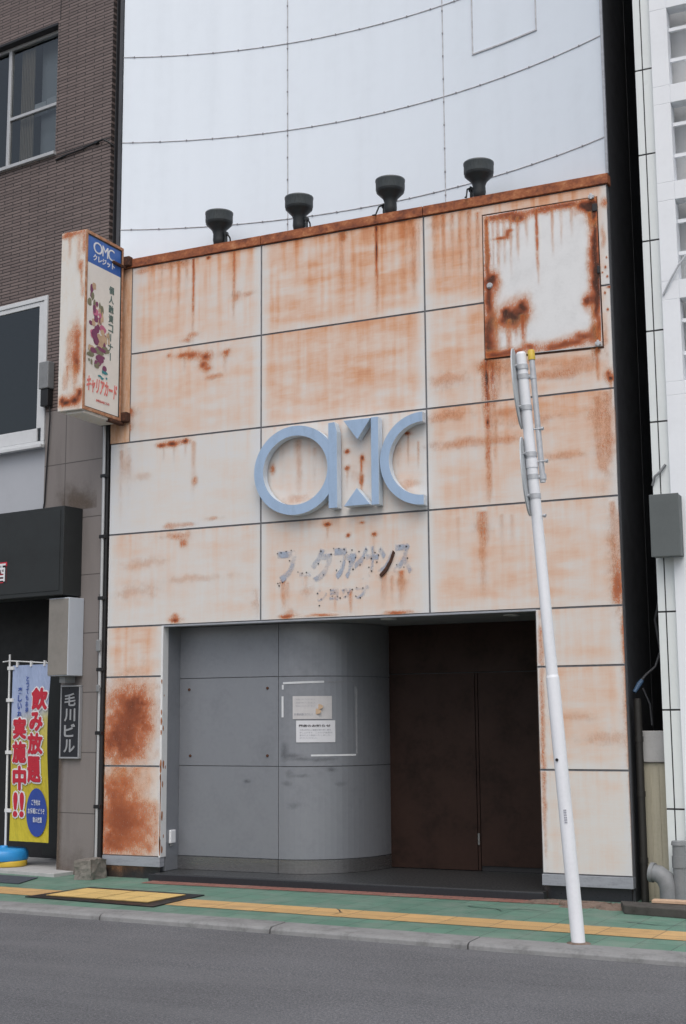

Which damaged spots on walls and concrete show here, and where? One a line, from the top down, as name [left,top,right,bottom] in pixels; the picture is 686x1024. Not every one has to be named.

corrosion [67,325,81,374]
corrosion [168,335,211,371]
corrosion [467,197,614,466]
corrosion [59,388,82,407]
corrosion [157,438,188,448]
corrosion [612,558,622,604]
corrosion [103,683,158,855]